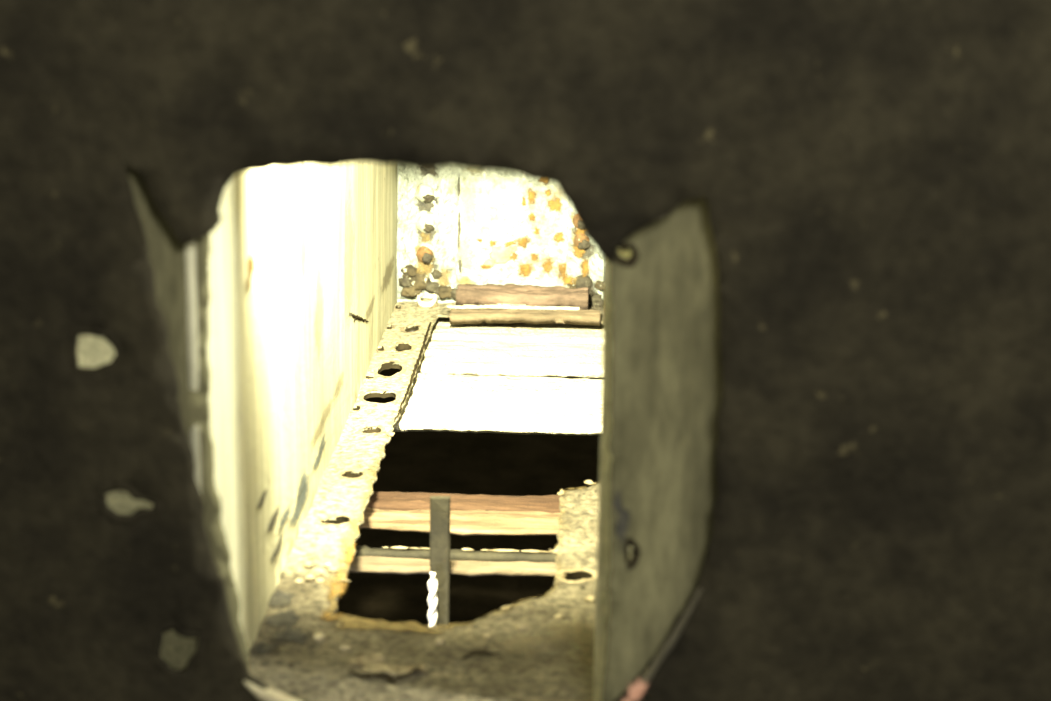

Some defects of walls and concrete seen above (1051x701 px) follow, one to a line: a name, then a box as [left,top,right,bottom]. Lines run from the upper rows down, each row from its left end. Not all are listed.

rust [398,223,475,299]
rust [477,179,605,307]